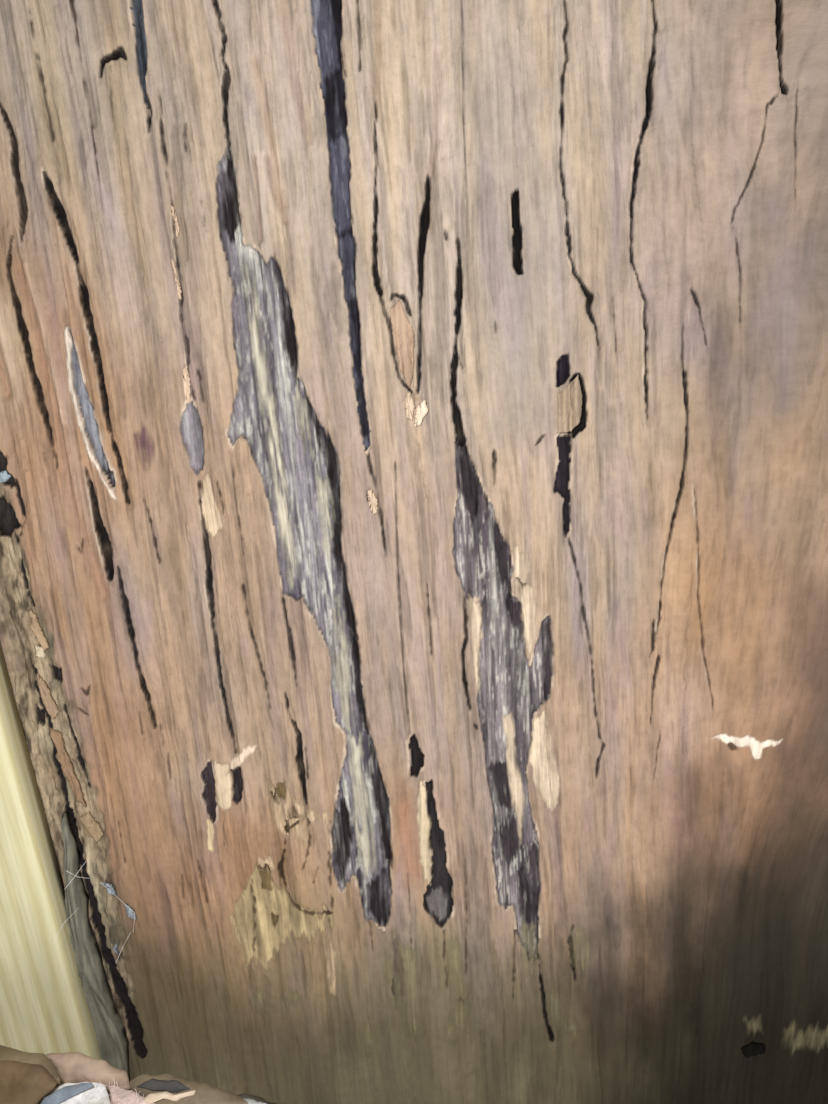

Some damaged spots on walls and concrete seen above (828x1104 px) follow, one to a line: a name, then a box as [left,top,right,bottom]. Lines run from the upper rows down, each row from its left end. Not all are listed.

crack [558,2,599,344]
crack [630,3,657,408]
crack [740,0,787,198]
crack [0,103,160,560]
peeling [0,470,11,484]
peeling [28,607,50,658]
crack [82,469,156,727]
crack [651,371,695,690]
peeling [37,673,104,842]
peeling [258,856,274,890]
peeling [270,783,328,844]
spalling [714,734,782,759]